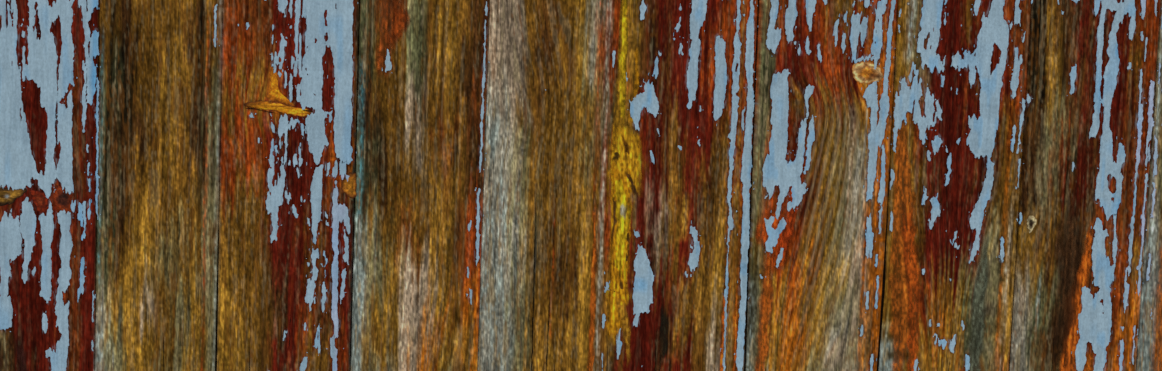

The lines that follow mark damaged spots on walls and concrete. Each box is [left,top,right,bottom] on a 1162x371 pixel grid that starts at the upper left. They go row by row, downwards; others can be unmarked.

peeling [0,0,101,371]
peeling [258,0,357,371]
peeling [601,231,654,371]
peeling [627,51,662,136]
peeling [673,0,827,371]
peeling [833,0,1033,338]
peeling [929,319,970,371]
peeling [1069,64,1077,94]
peeling [1071,0,1162,371]